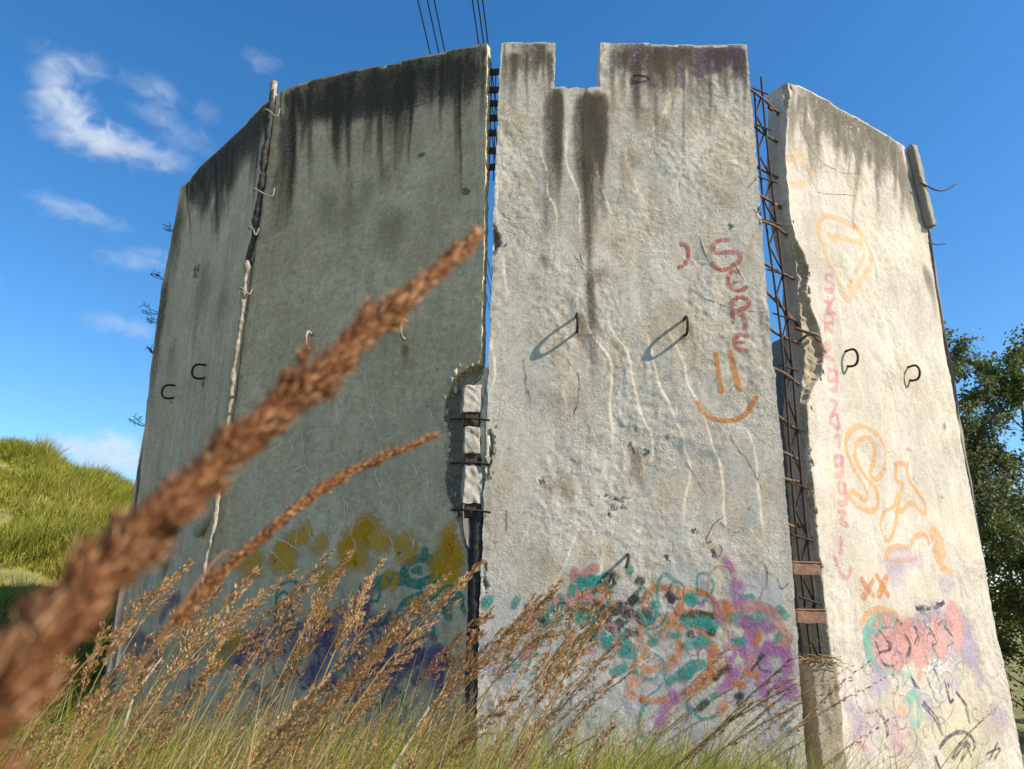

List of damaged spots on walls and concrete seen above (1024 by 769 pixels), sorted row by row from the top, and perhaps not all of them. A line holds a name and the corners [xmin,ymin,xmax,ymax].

damp [171,104,267,252]
damp [279,47,486,189]
damp [502,43,562,190]
damp [575,92,607,200]
damp [612,44,746,115]
spalling [781,83,793,111]
damp [789,89,913,207]
damp [153,284,168,364]
damp [587,280,596,337]
spalling [438,360,483,535]
spalling [485,425,498,479]
spalling [792,242,835,664]